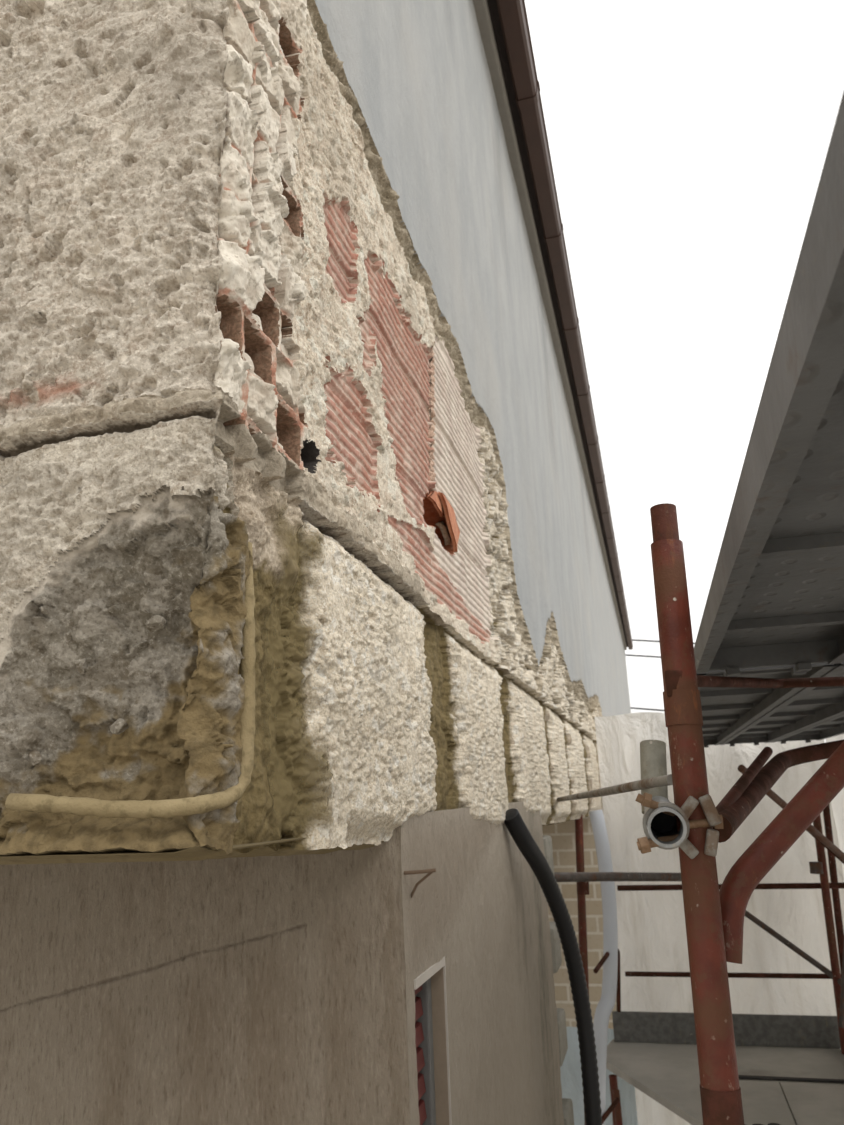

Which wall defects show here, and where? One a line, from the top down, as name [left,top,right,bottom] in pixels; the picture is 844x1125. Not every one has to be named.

crack [0,397,222,461]
spalling [214,135,309,470]
flaking render [307,0,603,741]
damp [262,513,333,837]